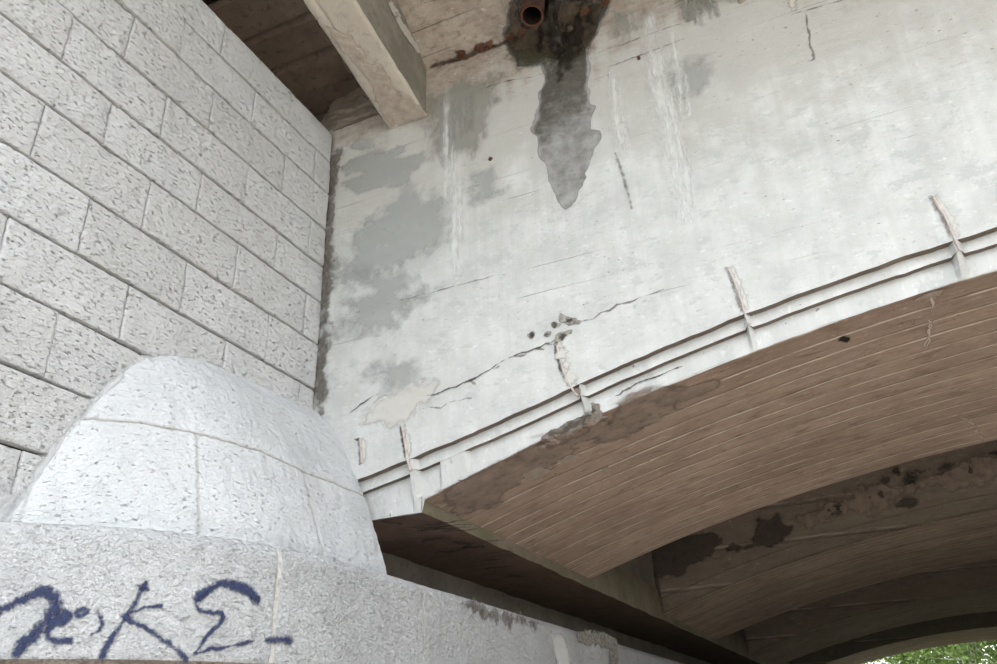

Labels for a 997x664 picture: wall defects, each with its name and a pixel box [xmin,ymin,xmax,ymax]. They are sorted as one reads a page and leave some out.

crack [797,0,842,61]
damp [503,0,706,218]
crack [584,289,663,321]
crack [427,341,553,409]
spalling [528,314,581,397]
crack [616,366,682,396]
spalling [444,380,720,516]